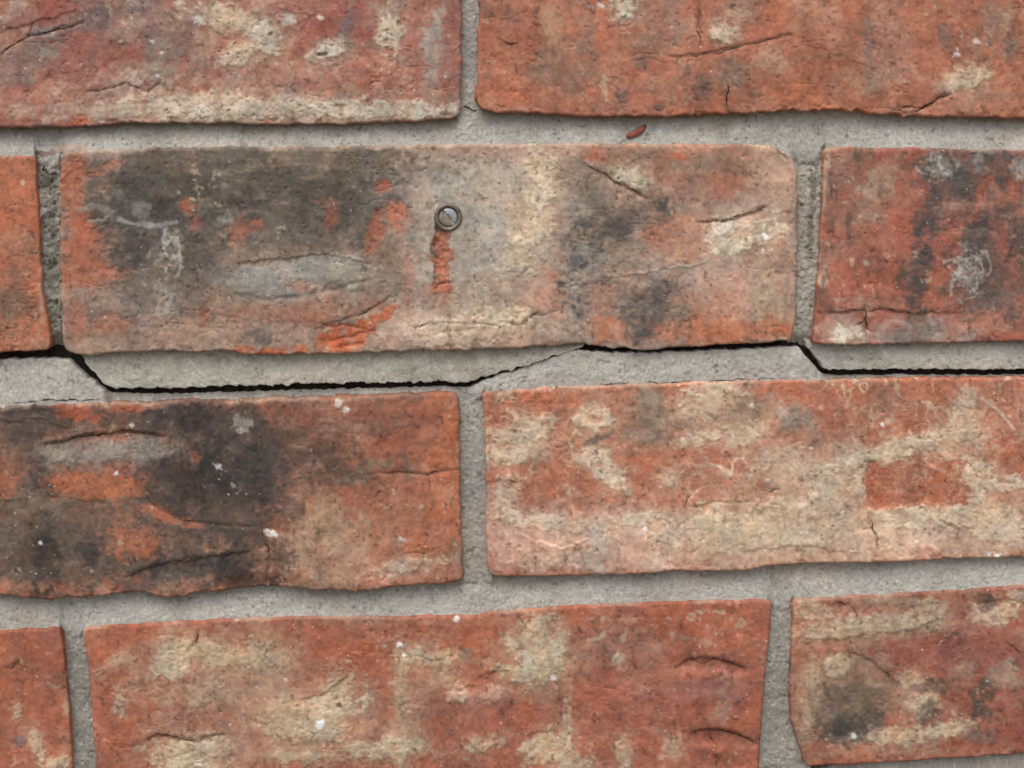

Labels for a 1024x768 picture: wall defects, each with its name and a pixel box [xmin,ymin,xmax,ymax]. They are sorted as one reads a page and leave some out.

crack [0,344,519,403]
crack [551,340,1024,385]